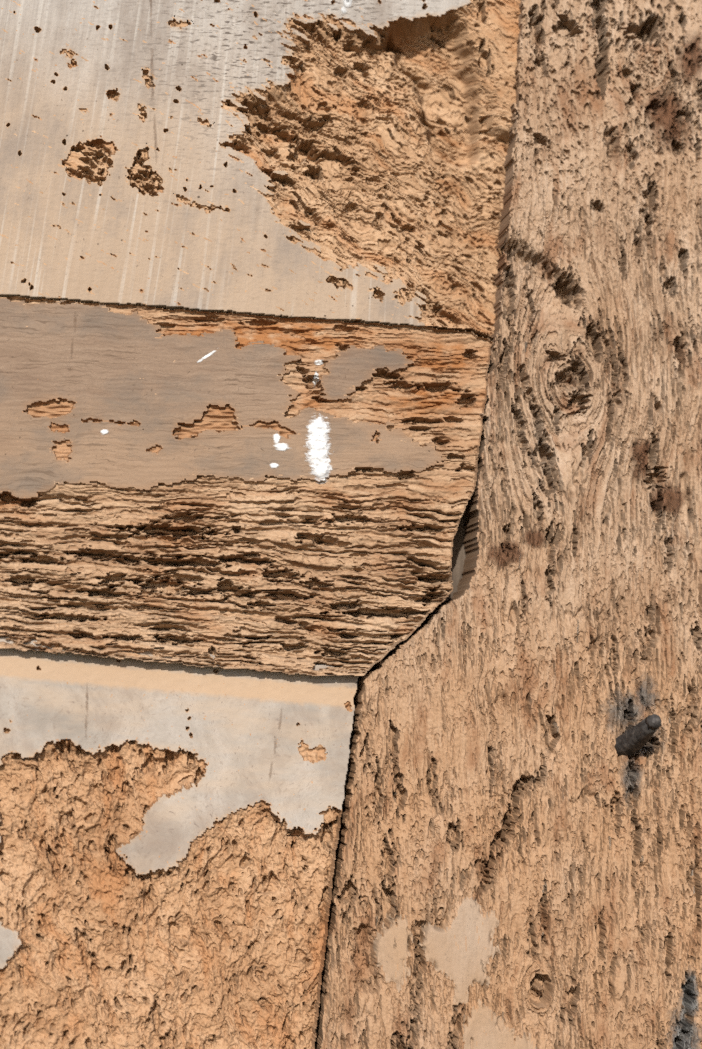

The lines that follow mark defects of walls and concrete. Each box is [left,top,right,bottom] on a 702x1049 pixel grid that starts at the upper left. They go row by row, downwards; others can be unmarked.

spalling [0,0,530,712]
spalling [0,694,342,1049]